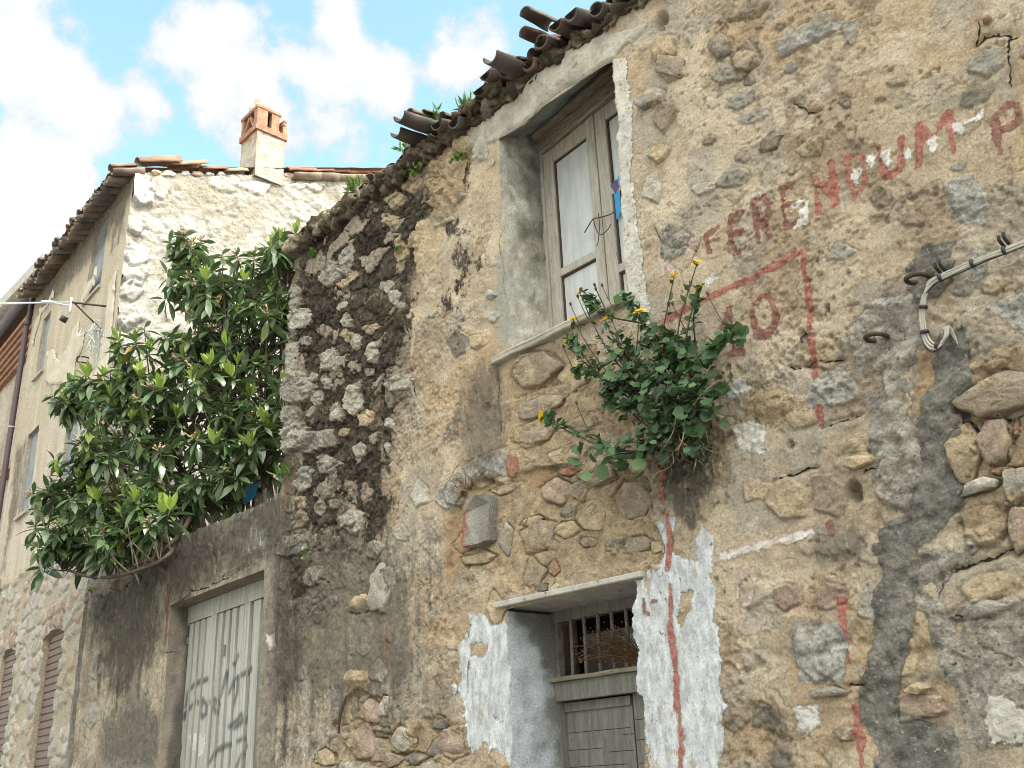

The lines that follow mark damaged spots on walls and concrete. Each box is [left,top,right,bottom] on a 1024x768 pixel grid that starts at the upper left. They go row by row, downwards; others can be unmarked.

crack [976,21,1019,87]
leakage [89,493,410,764]
flaking render [314,343,729,768]
leakage [664,454,713,528]
crack [776,467,817,481]
flaking render [944,343,1024,559]